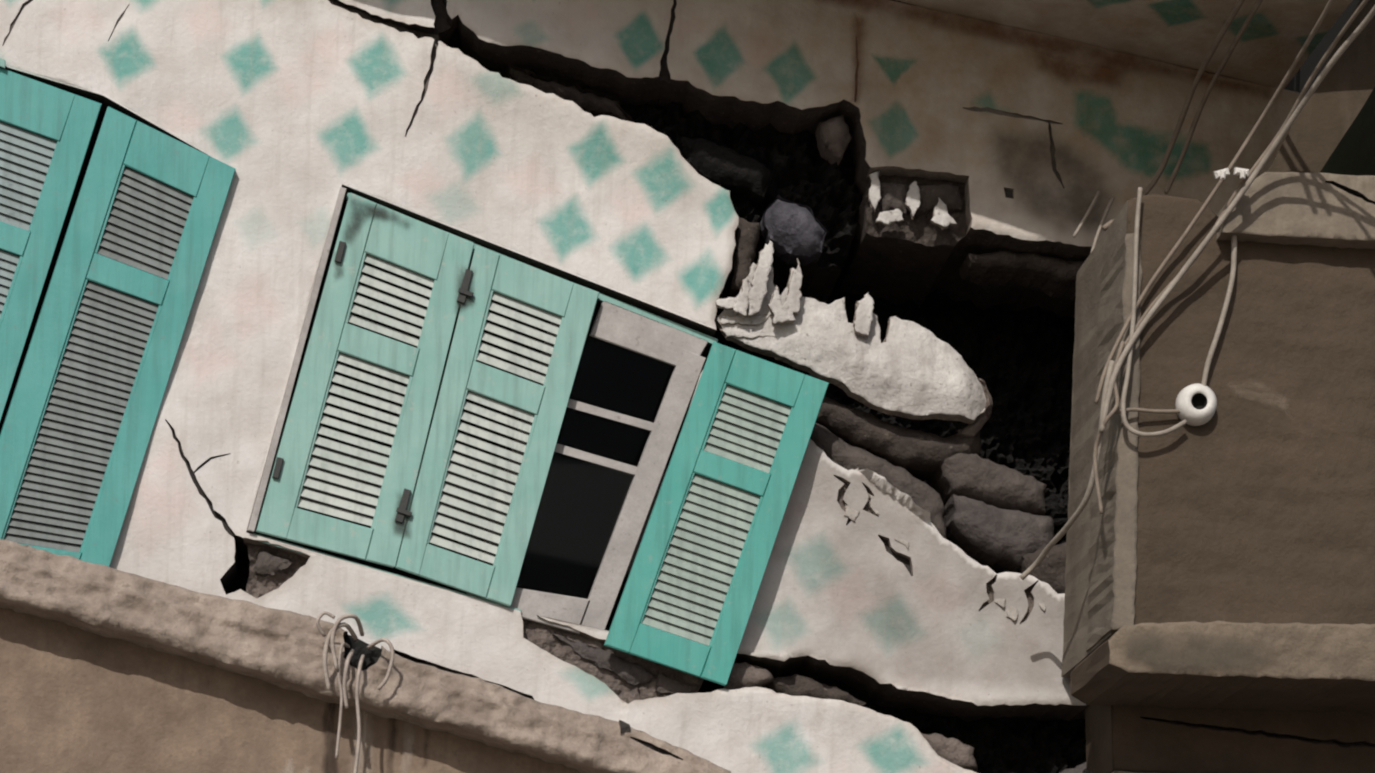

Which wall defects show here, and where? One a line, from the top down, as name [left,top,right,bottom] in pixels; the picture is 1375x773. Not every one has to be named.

crack [2,0,33,46]
crack [108,4,130,42]
crack [328,0,871,298]
spalling [865,166,972,247]
leakage [1000,137,1104,224]
crack [1325,181,1375,205]
peeling [715,240,993,438]
crack [165,419,236,537]
peeling [833,468,880,525]
peeling [878,534,913,576]
peeling [979,574,1046,624]
spalling [522,615,704,704]